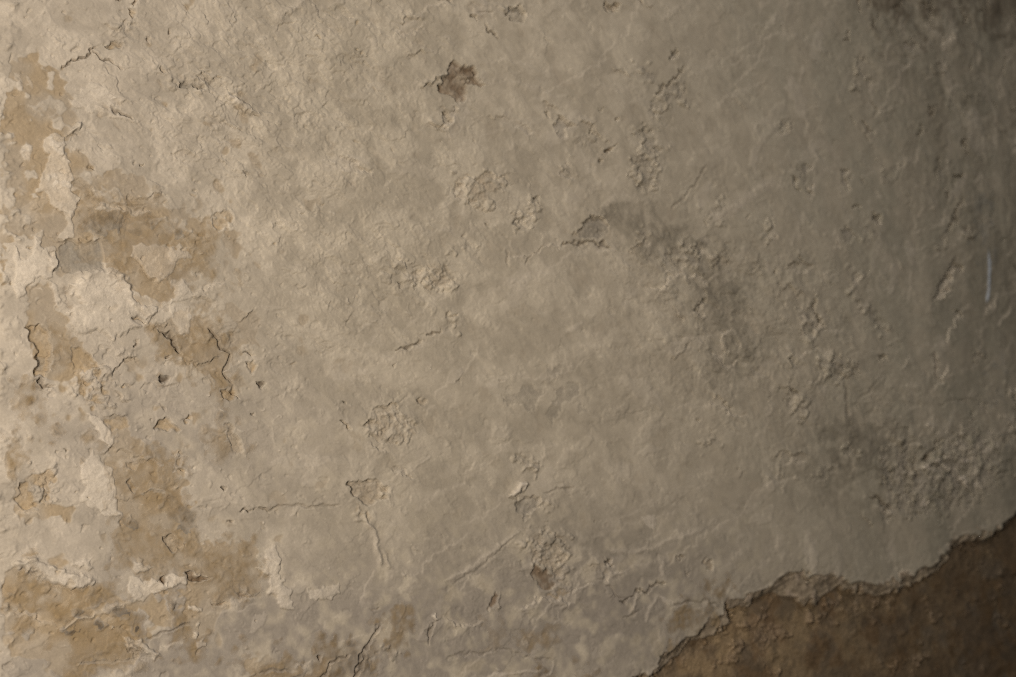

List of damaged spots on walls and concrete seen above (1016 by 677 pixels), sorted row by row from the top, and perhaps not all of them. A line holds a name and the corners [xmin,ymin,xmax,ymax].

crack [61,46,125,71]
spalling [420,60,489,131]
crack [71,175,167,217]
crack [190,279,227,303]
crack [207,309,256,384]
spalling [339,401,420,450]
spalling [345,477,395,571]
spalling [507,452,627,614]
peeling [128,561,214,603]
peeling [188,545,296,650]
crack [79,621,196,665]